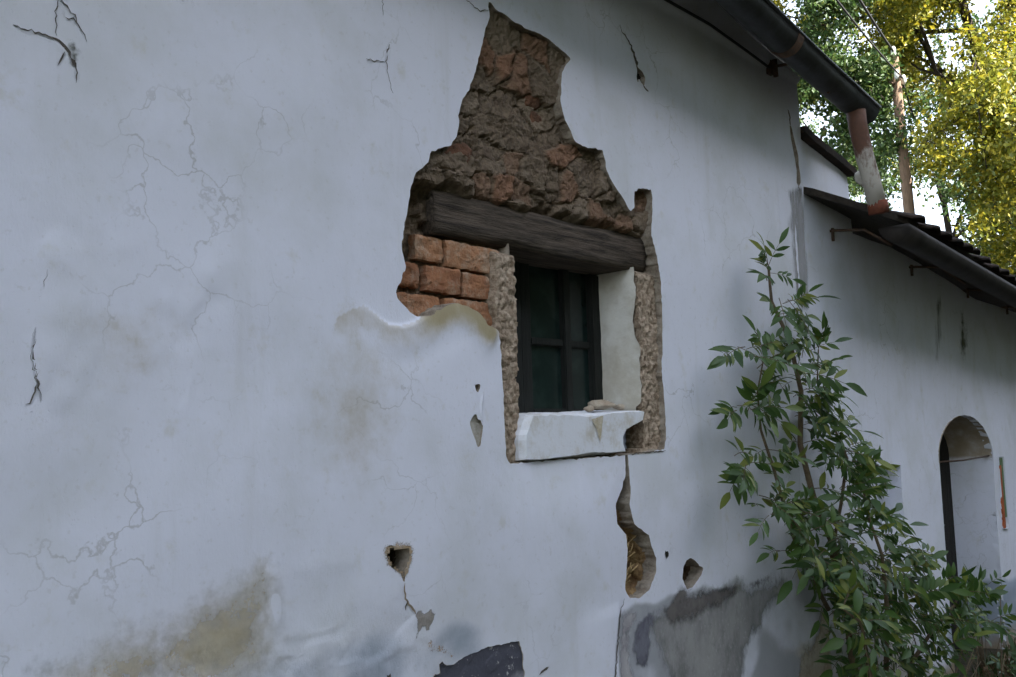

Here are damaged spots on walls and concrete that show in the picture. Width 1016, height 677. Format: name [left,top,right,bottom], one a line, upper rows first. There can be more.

crack [13,0,87,82]
crack [366,44,393,92]
crack [620,26,648,91]
spalling [396,7,648,463]
crack [23,325,42,404]
spalling [595,271,661,456]
leakage [166,596,260,677]
spalling [385,542,434,638]
peeling [428,641,524,677]
spalling [665,564,737,623]
leakage [654,580,784,677]